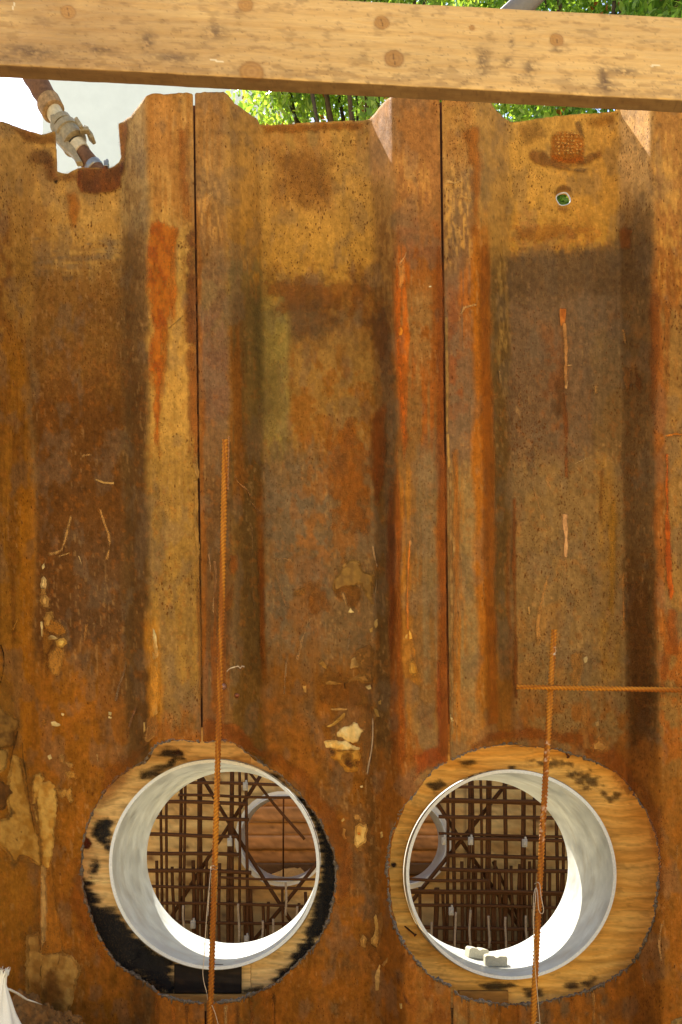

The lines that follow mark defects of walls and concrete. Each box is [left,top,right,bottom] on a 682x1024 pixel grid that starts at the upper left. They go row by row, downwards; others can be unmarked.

corrosion [16,123,127,224]
corrosion [263,122,362,132]
corrosion [551,132,584,163]
corrosion [146,220,197,452]
peeling [40,564,67,675]
peeling [332,559,375,613]
corrosion [394,246,459,772]
corrosion [473,245,662,870]
corrosion [661,454,679,687]
corrosion [205,720,260,754]
peeling [319,619,381,772]